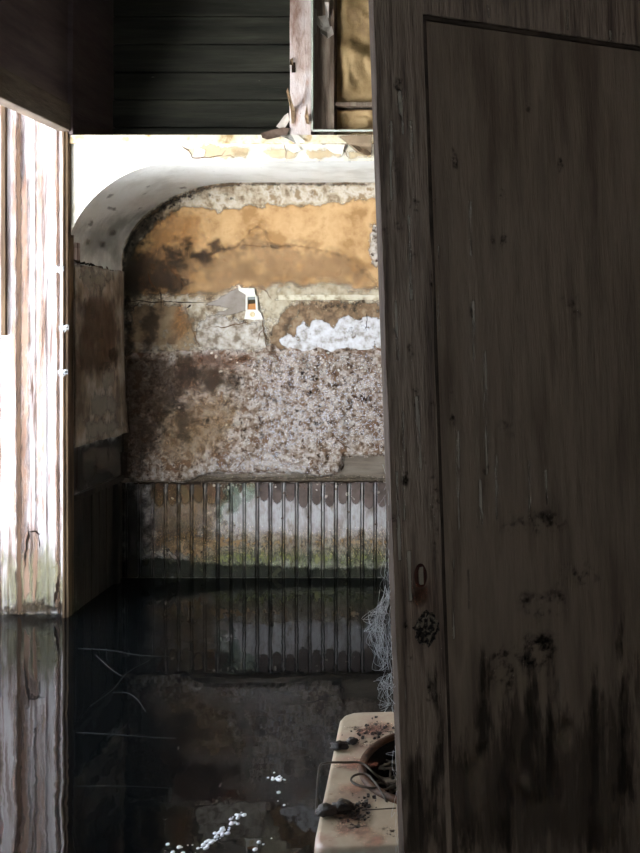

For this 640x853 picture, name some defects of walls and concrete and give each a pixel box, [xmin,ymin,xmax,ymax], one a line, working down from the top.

peeling [190,144,248,159]
peeling [261,88,372,159]
leakage [74,204,389,578]
flaking render [126,197,386,518]